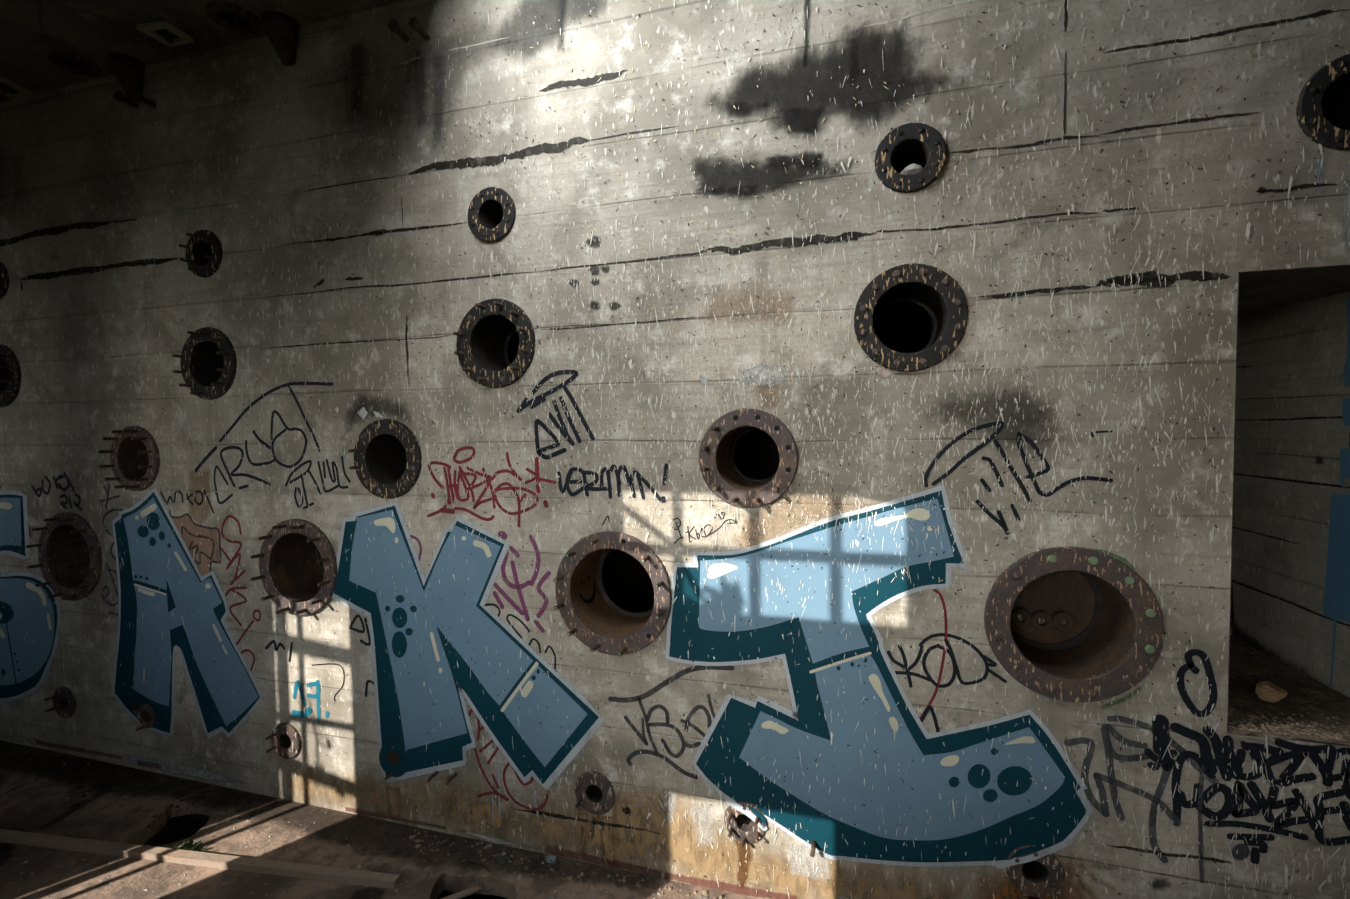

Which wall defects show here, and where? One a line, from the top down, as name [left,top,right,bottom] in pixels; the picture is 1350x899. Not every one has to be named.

leakage [711,0,942,135]
crack [283,126,676,245]
leakage [695,154,842,196]
crack [261,207,1139,381]
crack [977,270,1230,298]